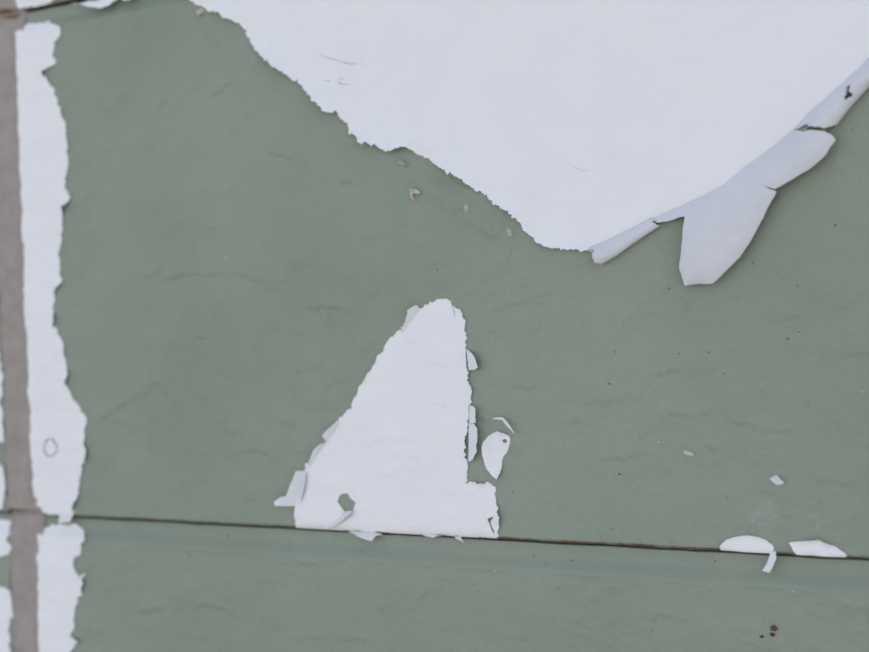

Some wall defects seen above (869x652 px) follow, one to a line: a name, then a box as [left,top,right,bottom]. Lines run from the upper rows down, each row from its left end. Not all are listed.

peeling [16,0,53,9]
peeling [190,0,869,286]
peeling [15,21,88,652]
peeling [274,298,515,542]
peeling [0,464,12,556]
peeling [720,535,776,573]
peeling [789,540,847,557]
peeling [0,586,13,652]